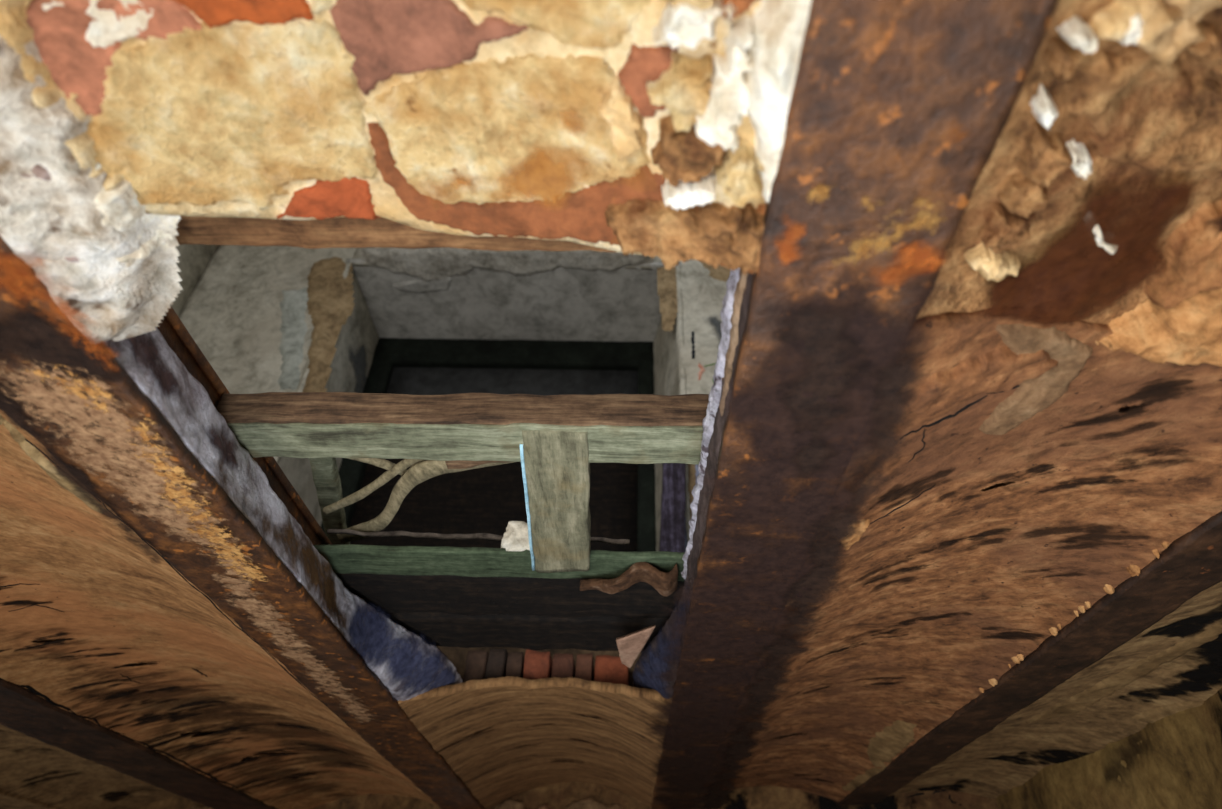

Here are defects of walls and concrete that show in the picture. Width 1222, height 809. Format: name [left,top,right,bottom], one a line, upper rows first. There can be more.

corrosion [810,186,829,199]
corrosion [853,200,940,282]
corrosion [55,306,104,360]
peeling [904,200,1222,435]